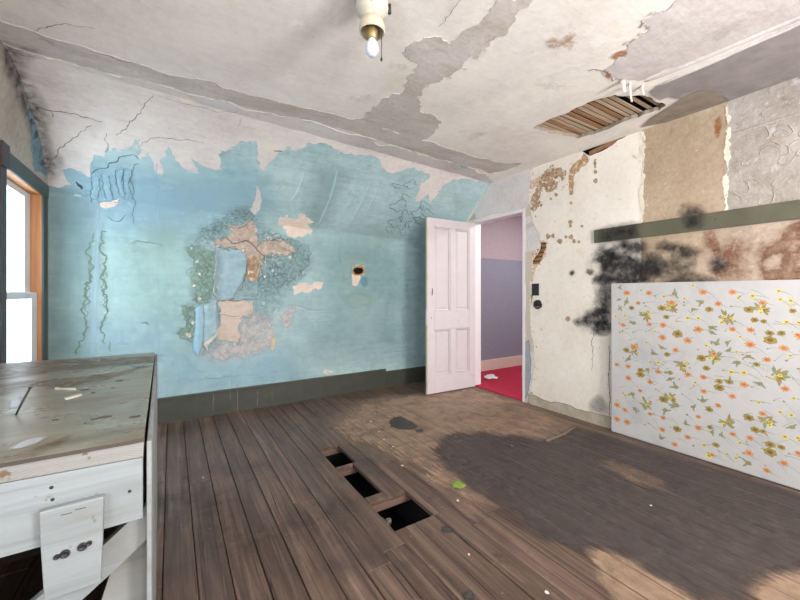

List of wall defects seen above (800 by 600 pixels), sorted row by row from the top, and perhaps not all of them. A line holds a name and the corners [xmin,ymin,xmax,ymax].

leakage [5,48,41,138]
peeling [0,0,533,203]
crack [36,96,240,246]
spalling [528,165,566,226]
spalling [638,102,728,223]
spalling [208,186,314,360]
peeling [292,282,324,295]
spalling [352,265,367,286]
leakage [576,226,705,334]
leakage [706,233,740,276]
leakage [761,223,800,280]
leakage [436,426,800,600]